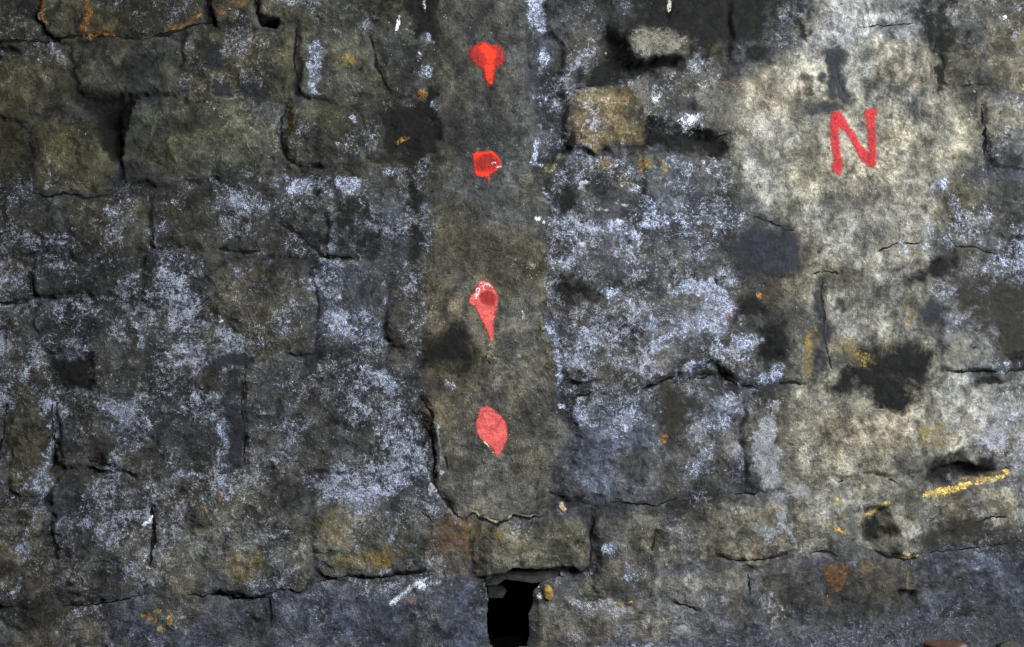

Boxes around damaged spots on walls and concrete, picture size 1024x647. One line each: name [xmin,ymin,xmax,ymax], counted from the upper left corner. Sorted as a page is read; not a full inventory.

rust [79,0,115,41]
crack [643,359,803,389]
crack [421,398,562,526]
rust [923,469,1010,498]